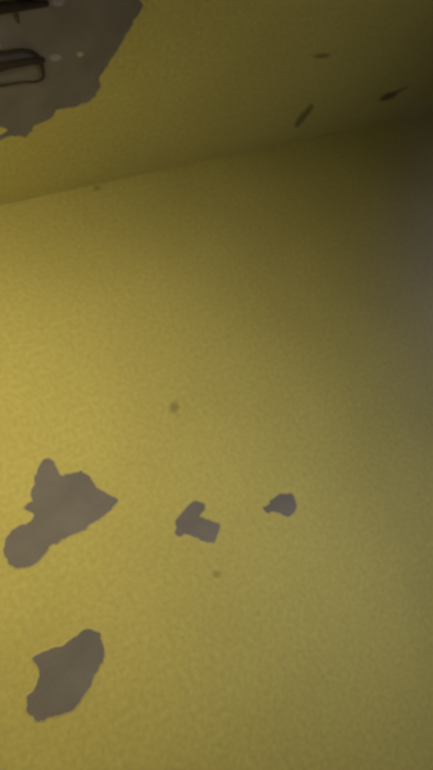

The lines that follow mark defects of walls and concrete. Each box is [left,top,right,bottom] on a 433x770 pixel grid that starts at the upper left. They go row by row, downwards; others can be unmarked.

peeling [0,0,144,141]
peeling [2,457,120,570]
peeling [173,499,221,544]
peeling [261,492,298,518]
peeling [24,627,106,724]